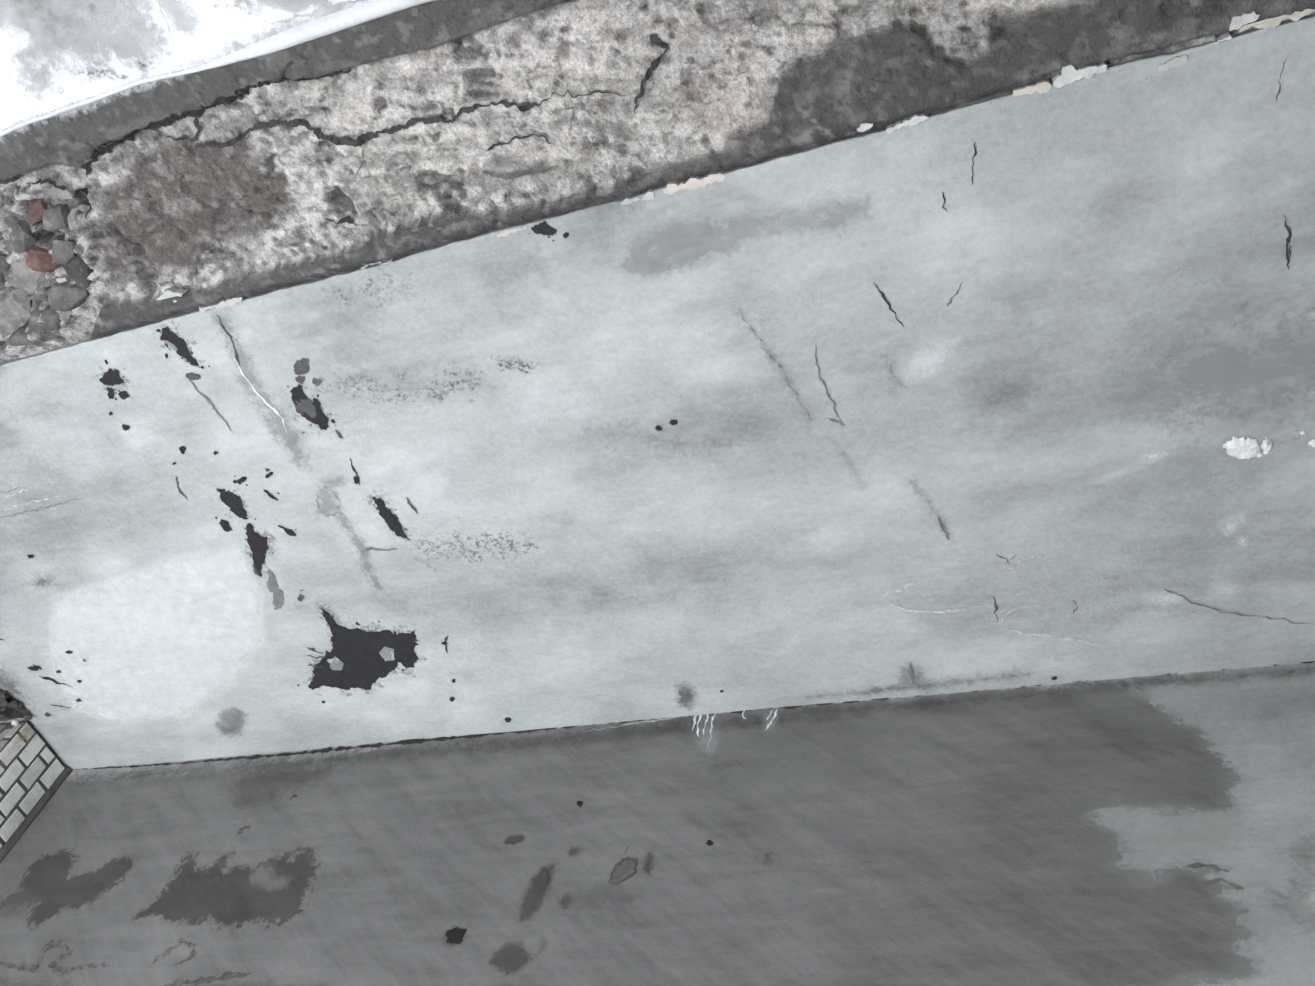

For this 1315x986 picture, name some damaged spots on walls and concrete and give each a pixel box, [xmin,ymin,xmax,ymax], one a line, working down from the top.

crack [0,34,668,219]
crack [324,216,360,226]
spalling [0,0,1315,439]
crack [1284,216,1292,270]
peeling [214,468,304,610]
peeling [350,458,538,562]
spalling [0,664,82,726]
peeling [297,603,426,703]
crack [75,661,1314,781]
crack [1165,589,1312,624]
damp [0,662,1253,986]